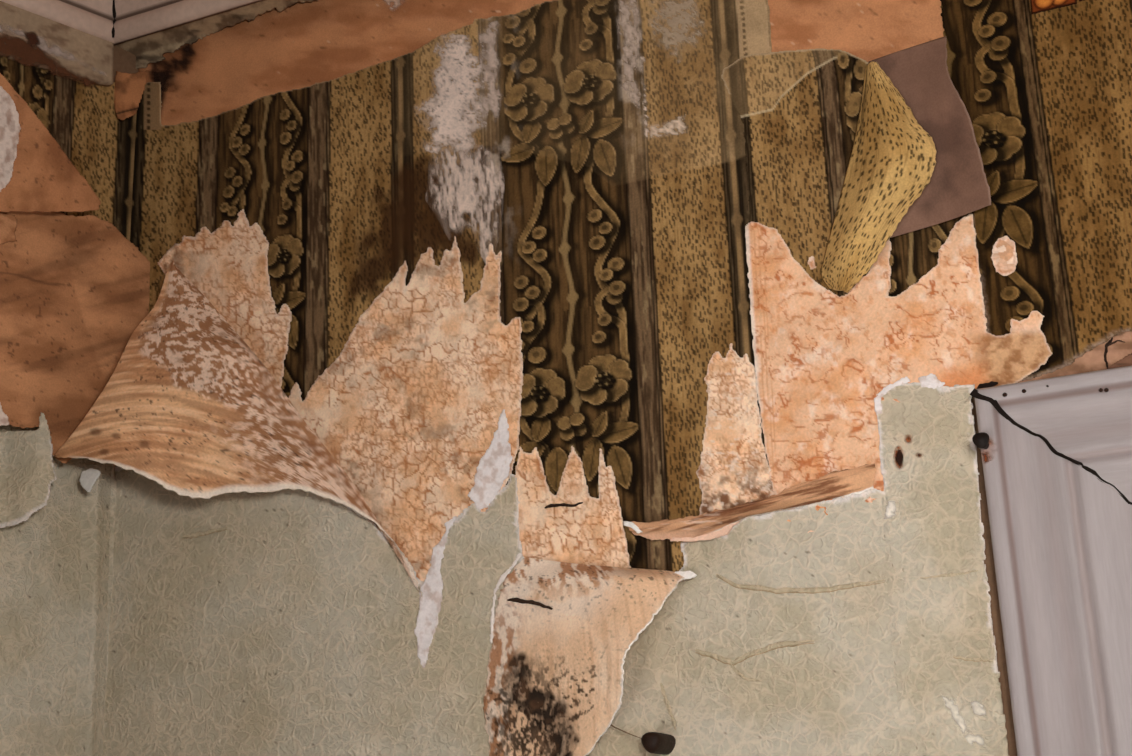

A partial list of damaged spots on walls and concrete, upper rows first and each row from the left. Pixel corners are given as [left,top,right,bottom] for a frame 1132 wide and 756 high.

water stain [479,22,500,116]
rust [894,435,911,469]
crack [970,388,1132,505]
crack [716,576,884,594]
crack [695,643,814,666]
mould [485,654,596,756]